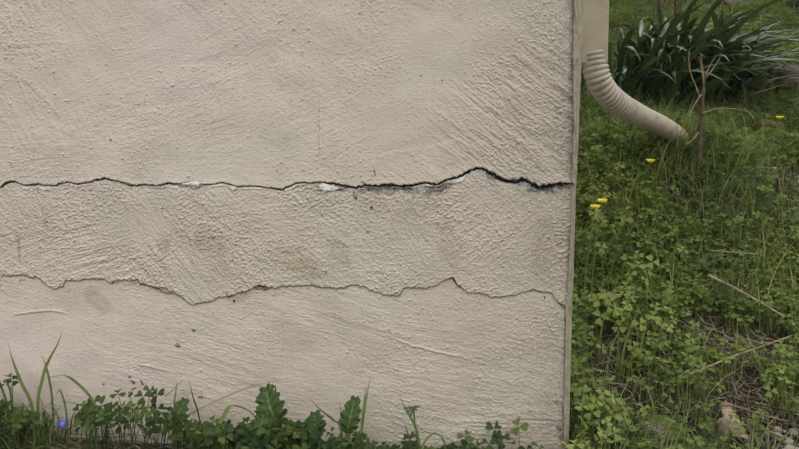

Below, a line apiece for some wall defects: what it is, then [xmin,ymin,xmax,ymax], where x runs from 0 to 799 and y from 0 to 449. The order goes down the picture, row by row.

crack [0,167,570,197]